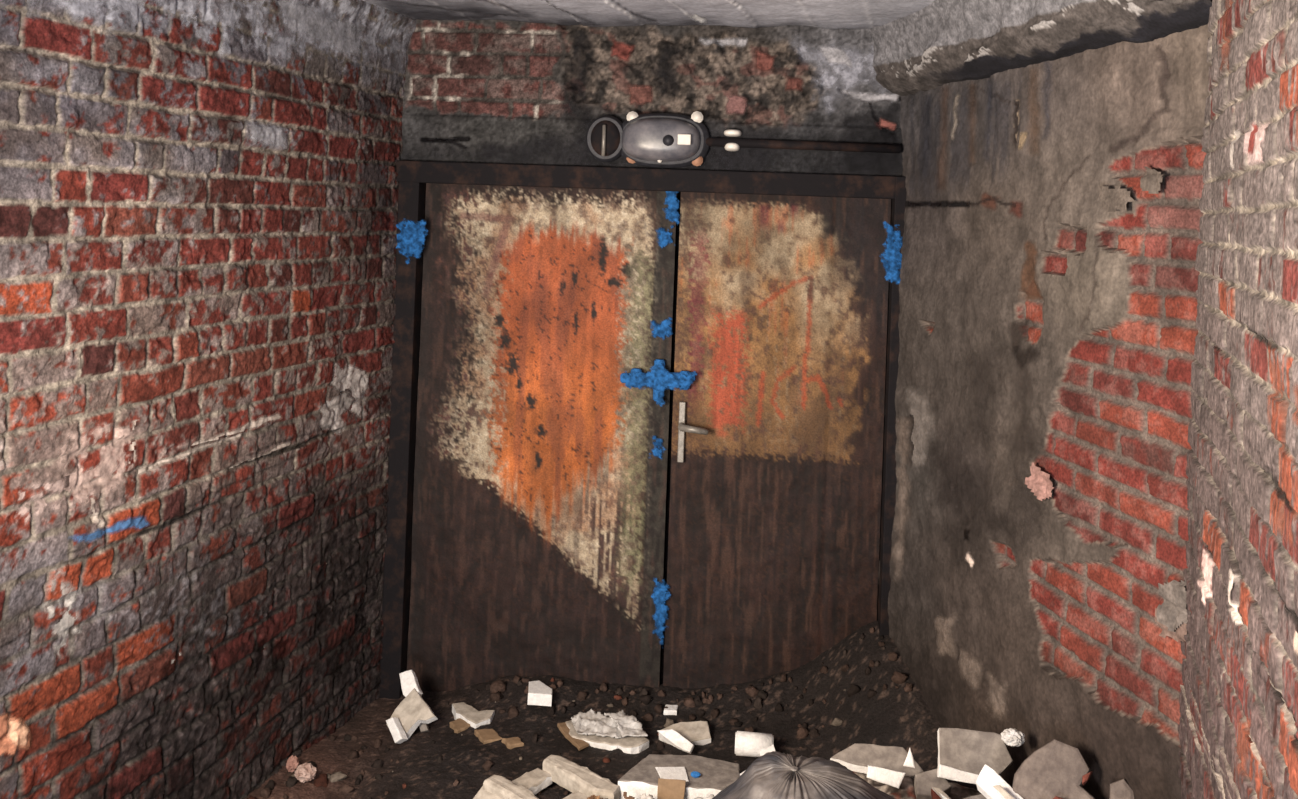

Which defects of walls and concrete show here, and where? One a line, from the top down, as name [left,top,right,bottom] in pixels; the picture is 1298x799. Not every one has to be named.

leakage [18,414,280,527]
leakage [320,364,369,433]
spalling [988,135,1206,749]
leakage [47,572,79,654]